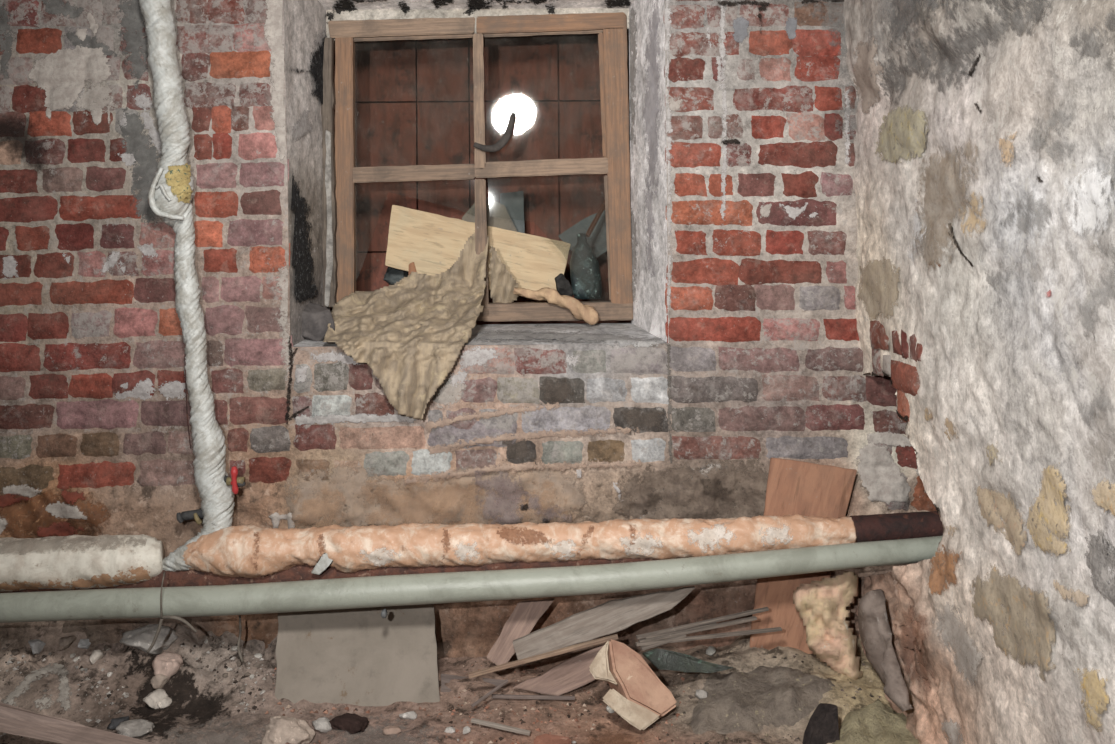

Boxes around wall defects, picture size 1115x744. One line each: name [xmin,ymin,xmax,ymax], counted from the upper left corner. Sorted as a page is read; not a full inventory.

flaking render [28,12,153,128]
water stain [0,120,42,168]
peeling [118,153,136,167]
flaking render [924,407,958,440]
flaking render [856,431,919,505]